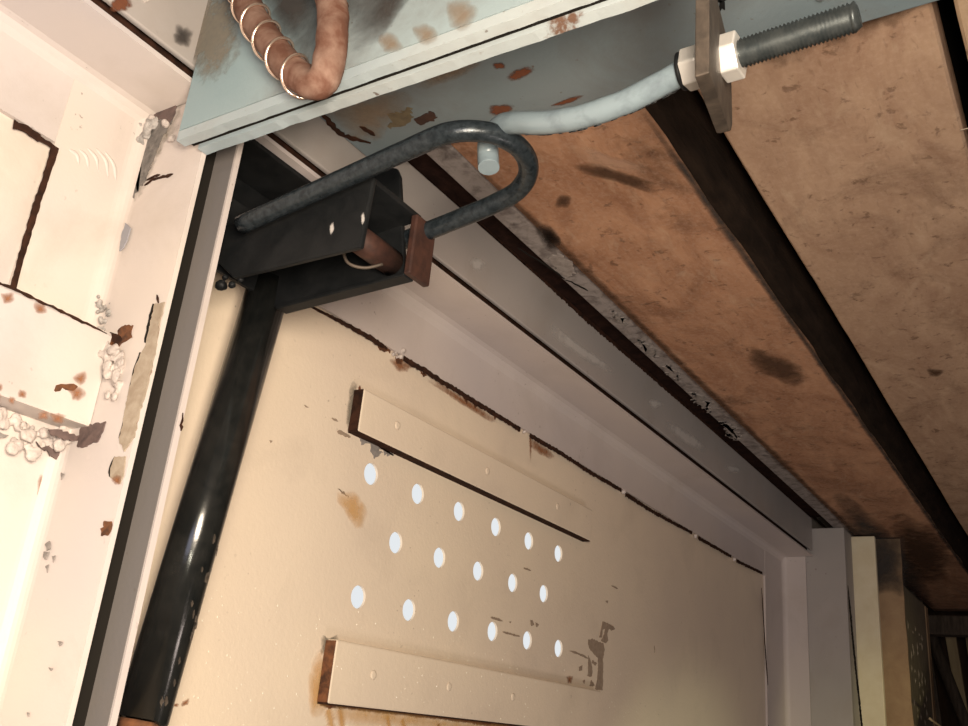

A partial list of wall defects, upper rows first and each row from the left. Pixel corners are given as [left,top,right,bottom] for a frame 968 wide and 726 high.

rust [493,63,532,80]
peeling [133,105,177,198]
peeling [108,295,165,484]
rust [345,386,590,542]
rust [313,640,524,726]
spalling [568,621,615,690]